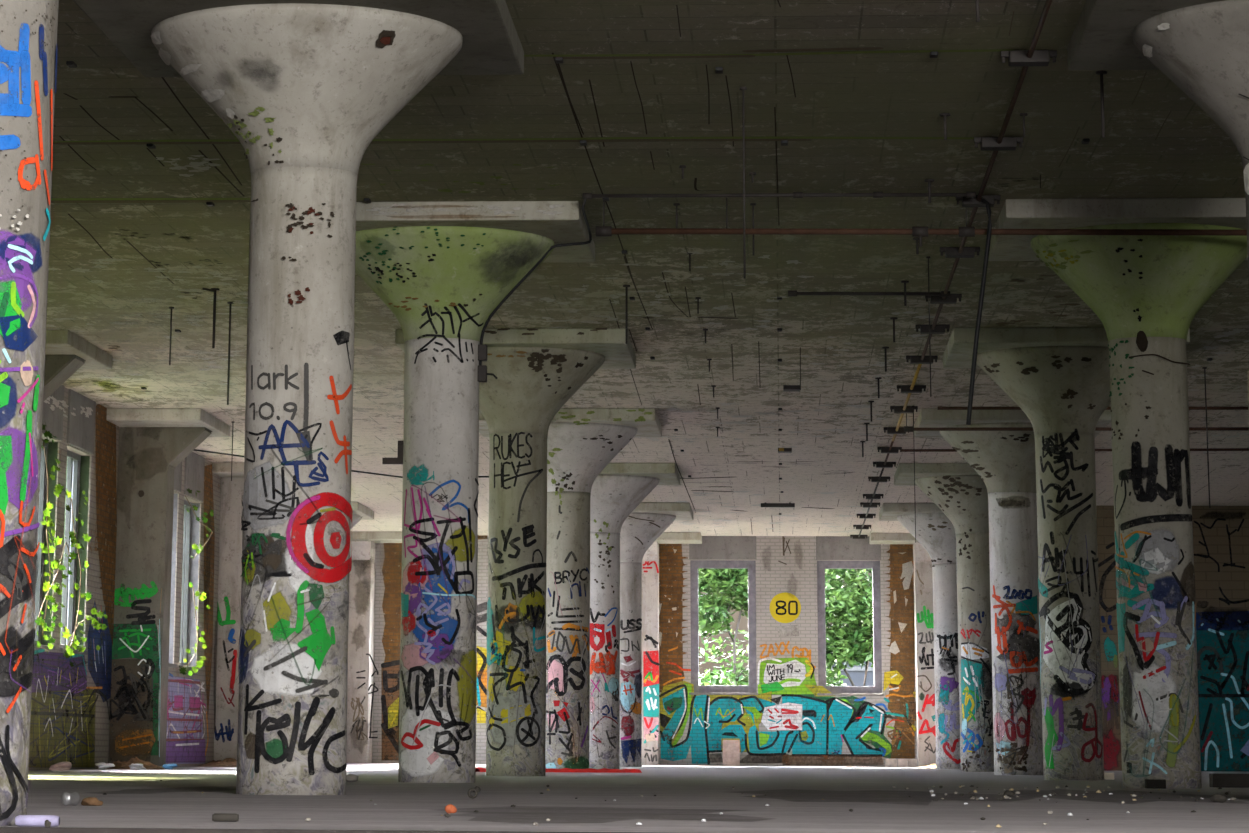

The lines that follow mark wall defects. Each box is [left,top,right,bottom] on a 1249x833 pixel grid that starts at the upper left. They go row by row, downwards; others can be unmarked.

flaking render [659,544,688,693]
flaking render [885,544,915,759]